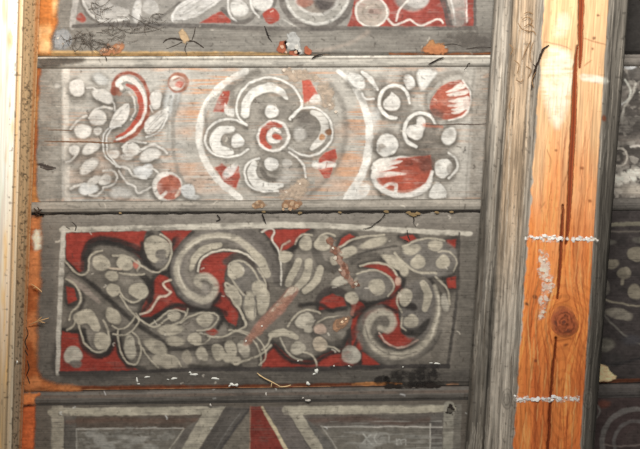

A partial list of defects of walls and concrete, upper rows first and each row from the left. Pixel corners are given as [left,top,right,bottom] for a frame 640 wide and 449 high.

peeling [277,32,312,56]
peeling [421,40,448,55]
crack [531,45,549,89]
crack [557,0,584,299]
damp [525,234,598,242]
damp [374,367,441,389]
damp [514,394,580,403]
crack [547,341,556,449]